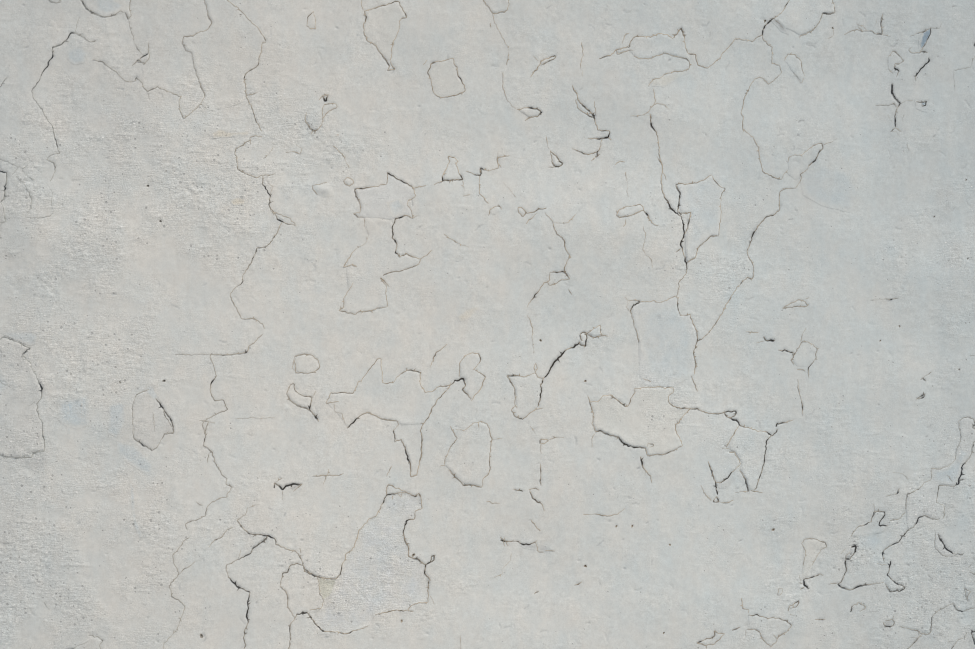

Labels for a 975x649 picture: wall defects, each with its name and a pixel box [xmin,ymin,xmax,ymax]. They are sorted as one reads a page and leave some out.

peeling [502,85,542,120]
peeling [599,28,762,116]
crack [890,59,930,146]
peeling [676,175,725,262]
crack [650,39,803,436]
peeling [579,325,606,347]
peeling [0,330,53,473]
peeling [132,385,174,450]
peeling [287,353,320,421]
peeling [701,426,772,503]
peeling [831,417,975,592]
peeling [697,538,827,649]